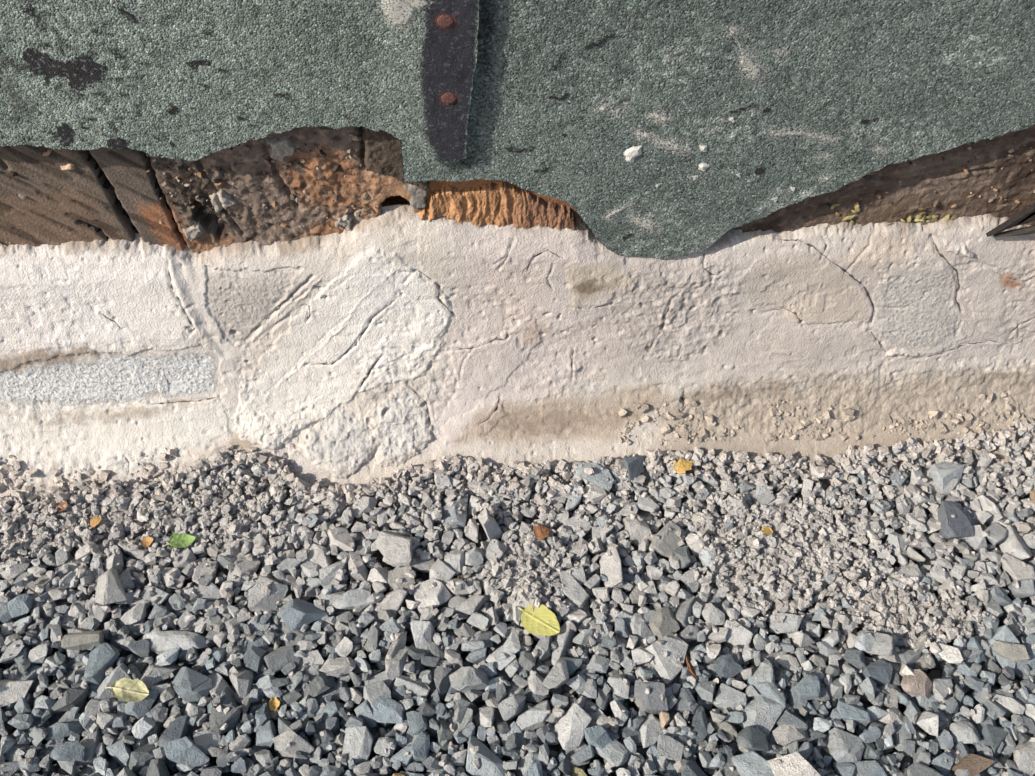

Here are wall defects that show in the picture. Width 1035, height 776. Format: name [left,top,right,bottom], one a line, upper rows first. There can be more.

crack [256,276,312,329]
crack [309,302,392,365]
crack [406,270,455,316]
crack [500,241,562,288]
crack [779,239,885,351]
crack [931,236,961,312]